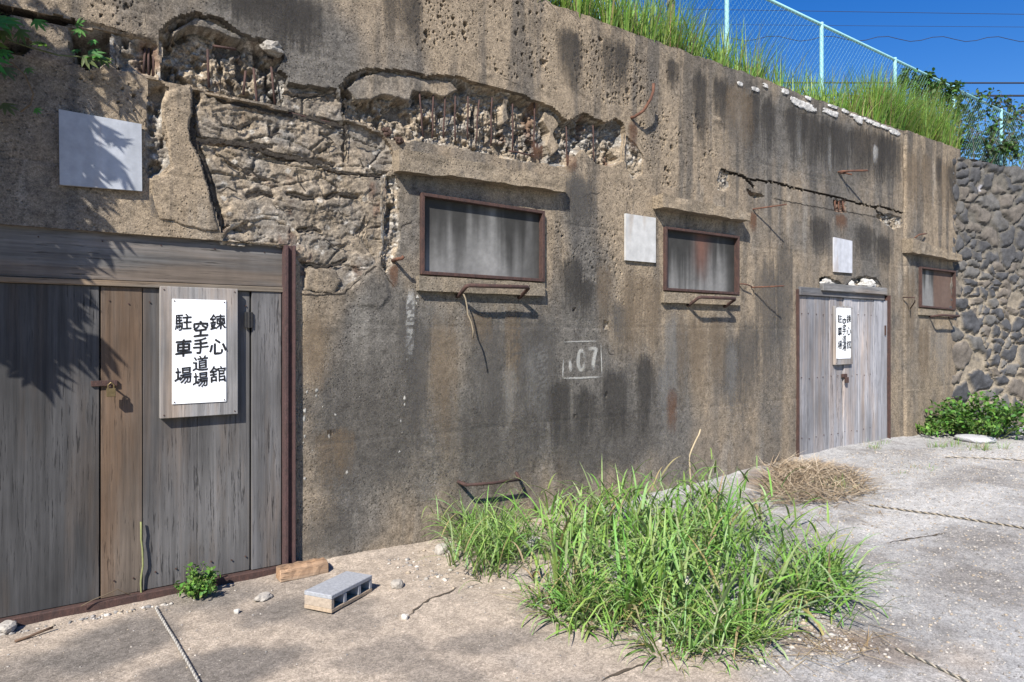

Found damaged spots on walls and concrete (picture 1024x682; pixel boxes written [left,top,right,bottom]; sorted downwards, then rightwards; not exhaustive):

water stain [668,60,679,88]
crack [189,91,222,232]
spalling [65,0,729,337]
crack [721,151,905,222]
water stain [694,74,955,204]
peeling [782,88,901,136]
water stain [859,226,889,259]
water stain [564,259,594,307]
spalling [819,276,882,288]
water stain [473,315,626,437]
water stain [639,358,653,415]